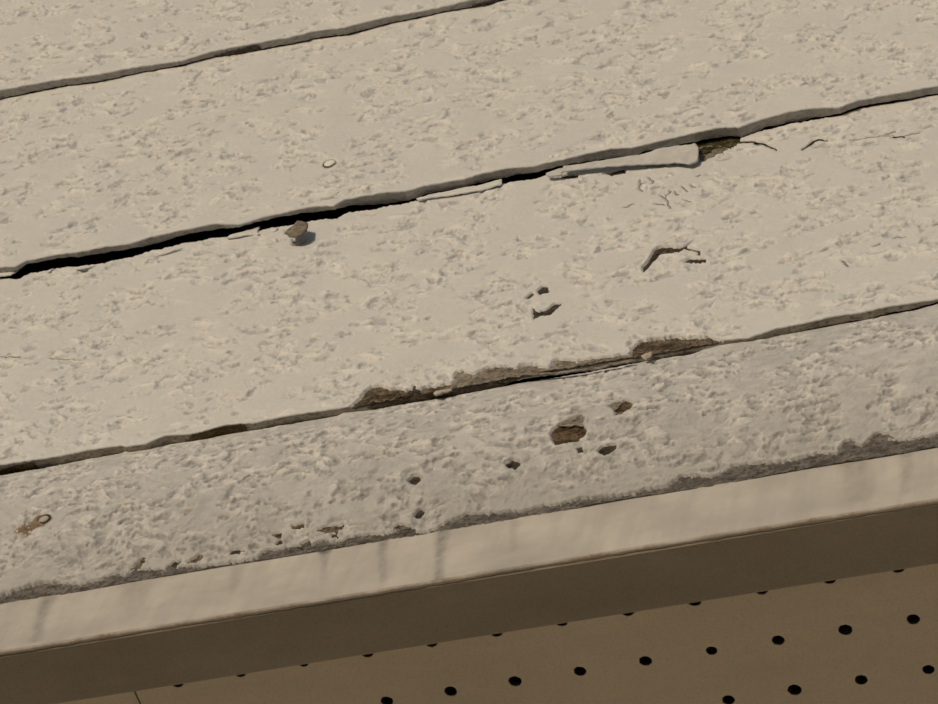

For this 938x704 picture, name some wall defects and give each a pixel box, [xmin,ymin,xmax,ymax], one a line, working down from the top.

crack [624,164,701,209]
crack [643,246,706,272]
peeling [352,338,721,409]
peeling [608,401,633,415]
peeling [550,415,587,453]
peeling [598,446,616,456]
spalling [317,525,344,539]